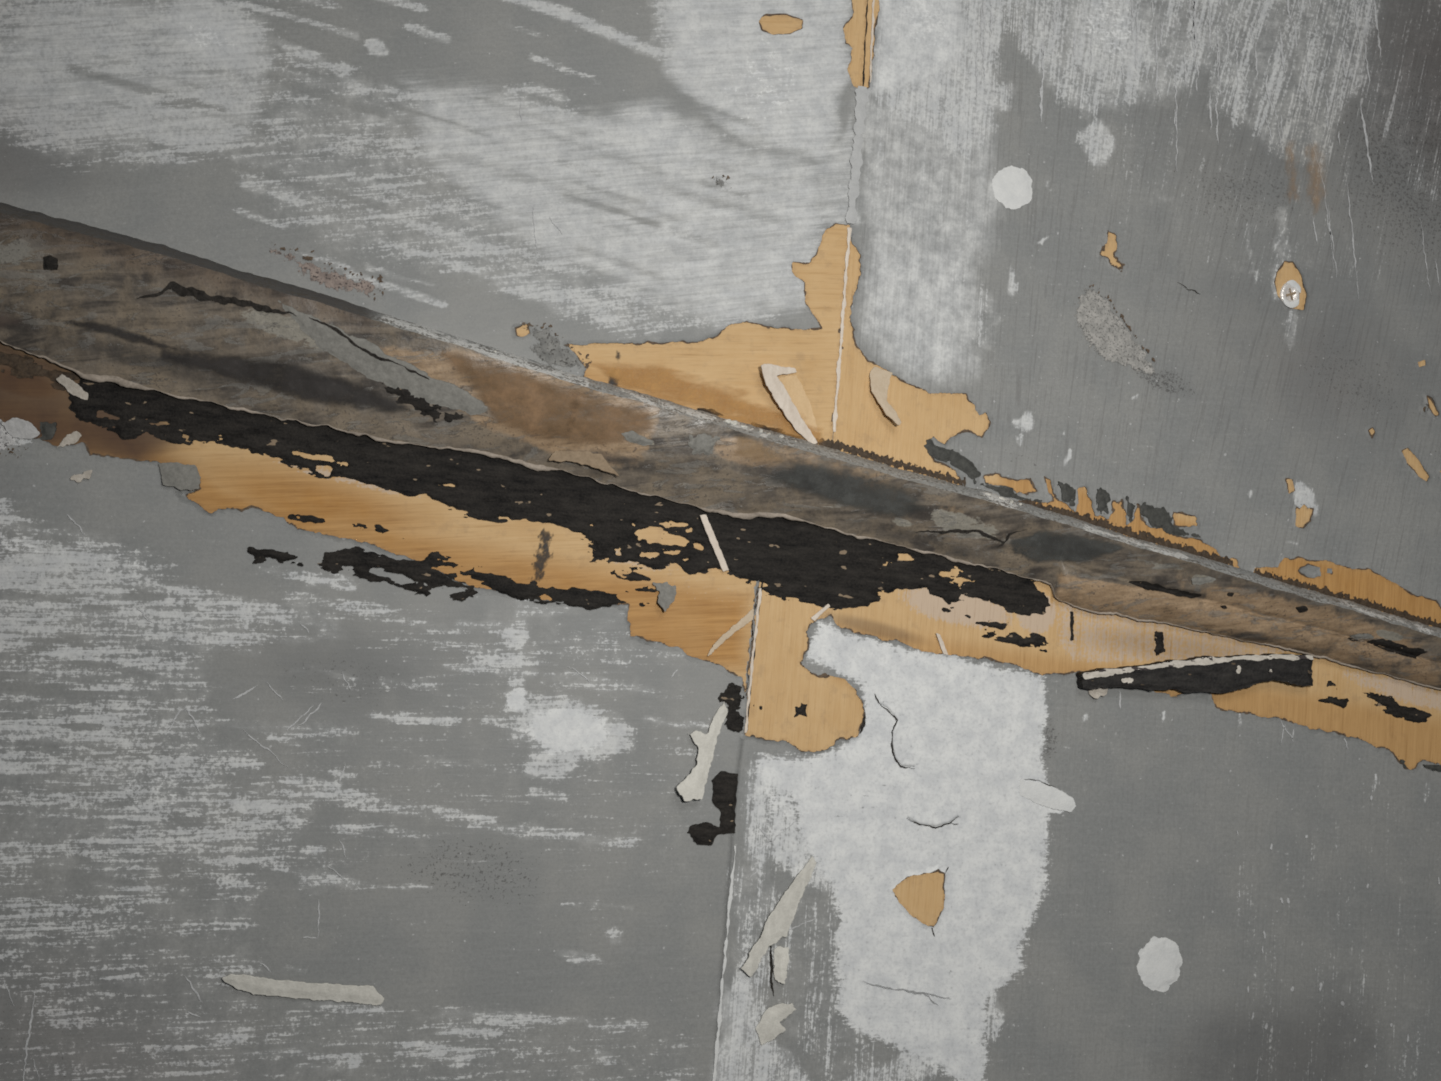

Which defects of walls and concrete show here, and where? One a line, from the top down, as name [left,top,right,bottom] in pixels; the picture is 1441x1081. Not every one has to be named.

peeling [278,300,491,415]
peeling [511,321,534,341]
peeling [562,219,1441,626]
peeling [0,341,1441,774]
crack [860,691,916,769]
crack [907,805,959,828]
peeling [1019,779,1076,812]
peeling [888,865,949,933]
peeling [773,946,789,984]
peeling [755,1003,796,1045]